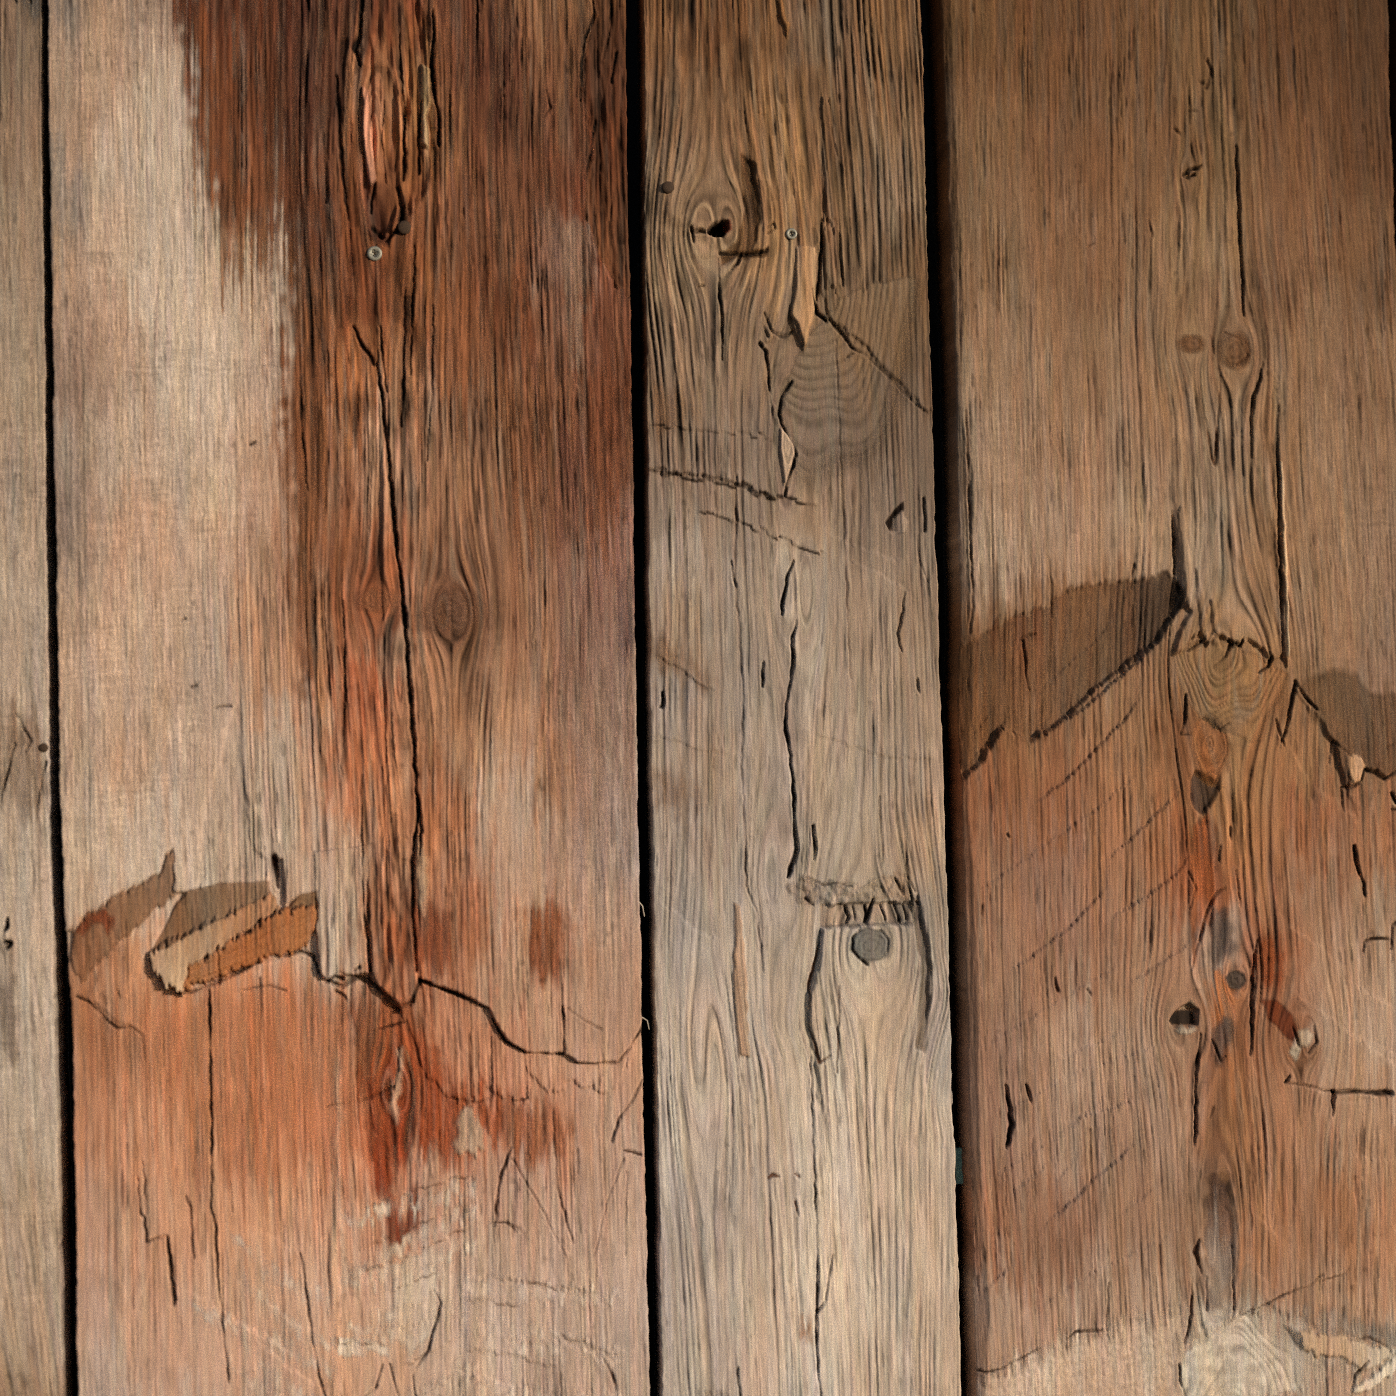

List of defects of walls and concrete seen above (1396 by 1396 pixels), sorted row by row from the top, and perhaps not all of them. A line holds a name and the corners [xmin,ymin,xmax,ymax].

crack [690,227,767,353]
crack [813,296,858,352]
crack [378,378,422,934]
crack [672,336,851,904]
peeling [1347,754,1365,783]
spalling [71,845,367,994]
spalling [787,873,930,1050]
crack [410,979,643,1084]
peeling [1176,1000,1196,1034]
peeling [1290,1029,1313,1060]
crack [495,1153,509,1224]
spalling [976,1304,1396,1396]